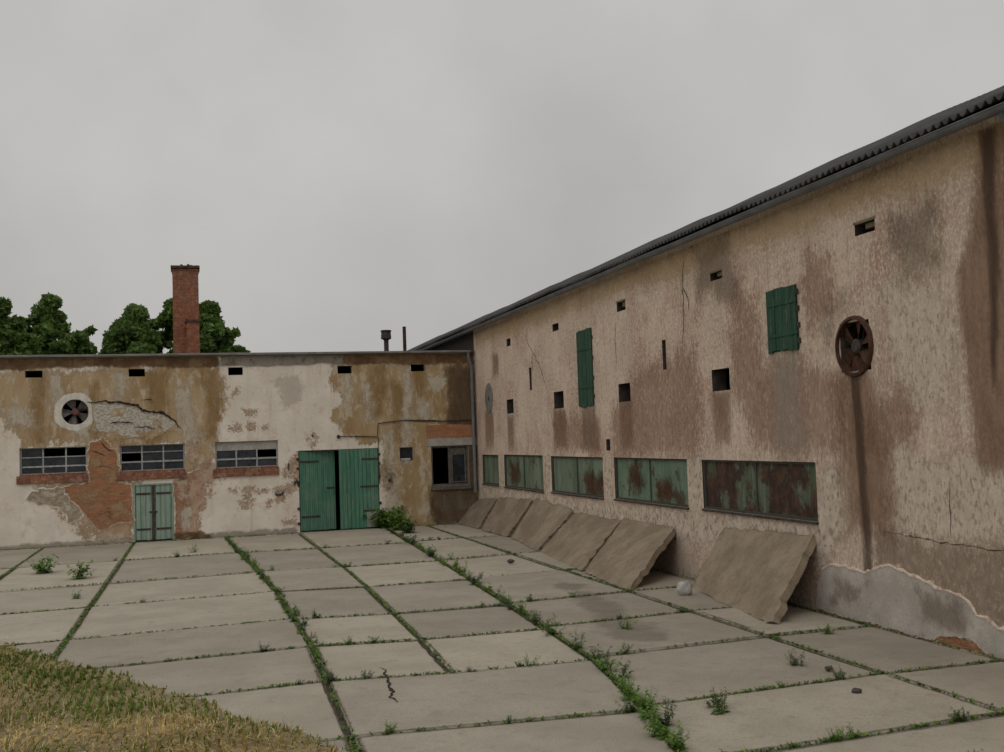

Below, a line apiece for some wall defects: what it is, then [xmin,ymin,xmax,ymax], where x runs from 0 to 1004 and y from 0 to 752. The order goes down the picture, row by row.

water stain [959,130,1004,469]
peeling [0,366,299,543]
water stain [0,353,478,525]
corrosion [627,464,685,504]
water stain [876,529,1004,627]